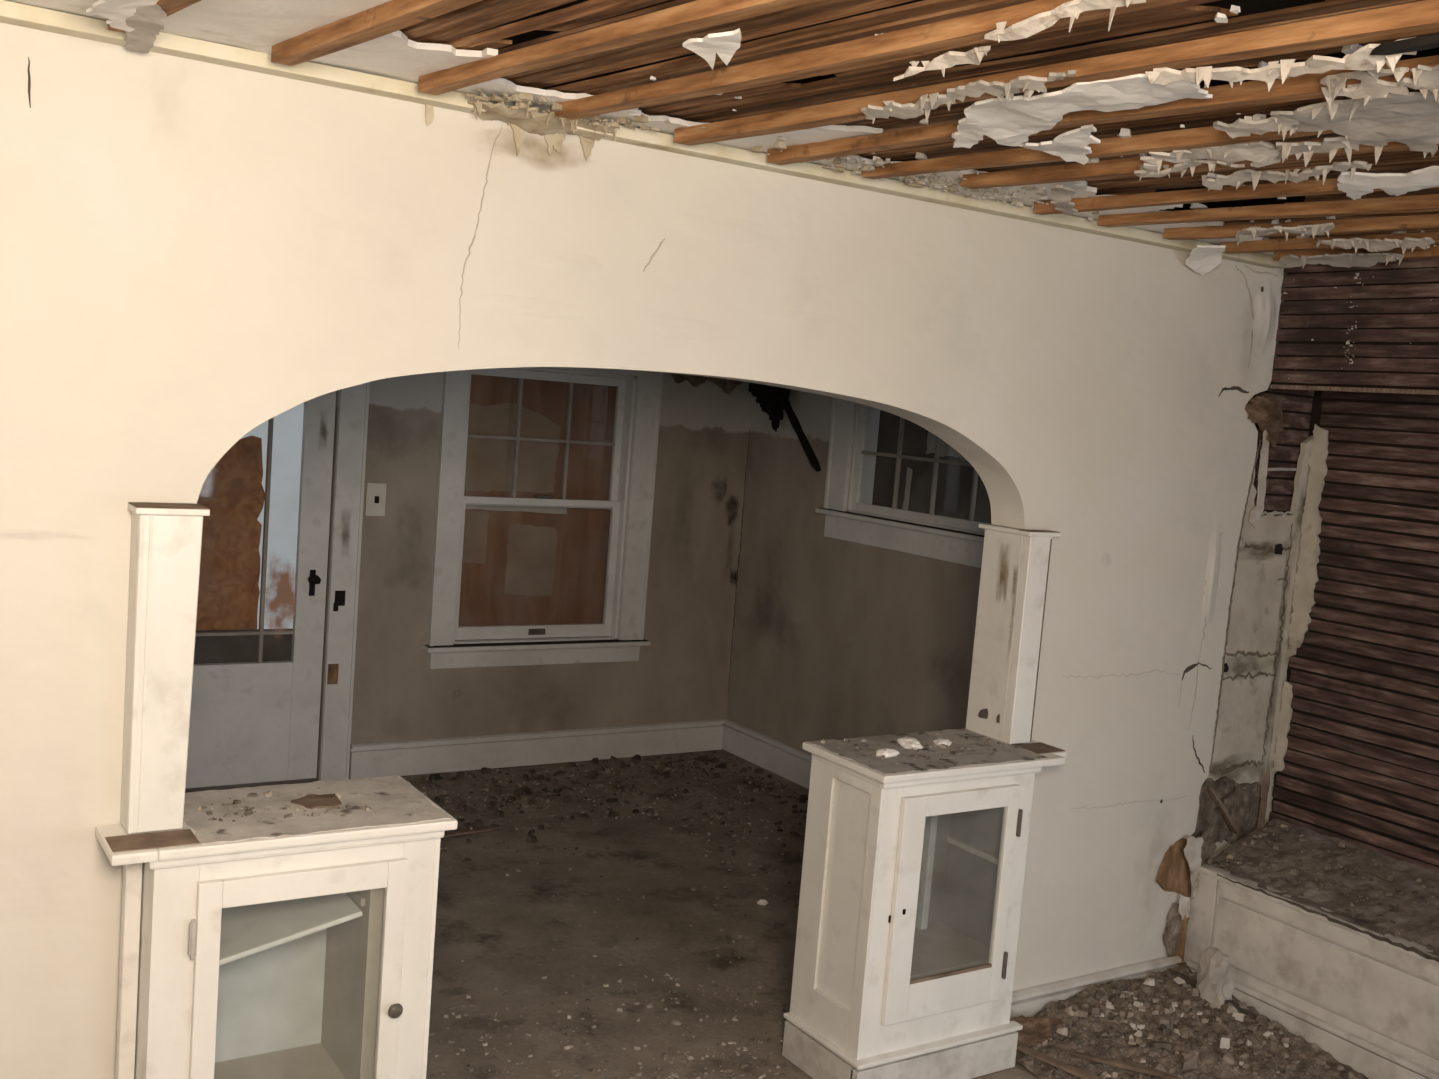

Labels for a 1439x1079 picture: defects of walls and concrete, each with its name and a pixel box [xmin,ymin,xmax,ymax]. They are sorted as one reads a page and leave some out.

peeling [86,0,167,53]
peeling [682,28,742,70]
spalling [464,88,671,131]
peeling [861,0,1439,200]
spalling [749,136,787,155]
spalling [801,152,1099,221]
crack [458,124,503,347]
peeling [1185,222,1435,276]
spalling [670,373,744,395]
spalling [1248,382,1314,516]
spalling [1163,770,1439,966]